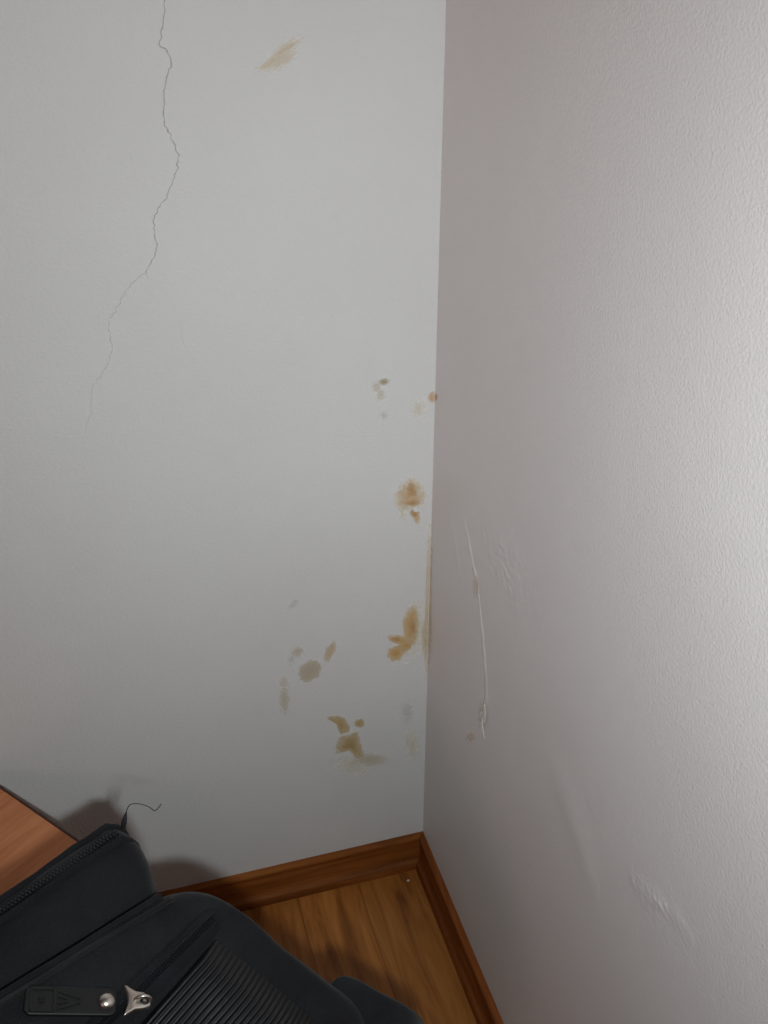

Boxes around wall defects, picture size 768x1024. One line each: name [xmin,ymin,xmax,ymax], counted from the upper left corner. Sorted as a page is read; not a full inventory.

crack [145,0,179,273]
damp [397,480,424,523]
damp [388,565,430,661]
damp [293,642,336,681]
damp [328,716,383,765]